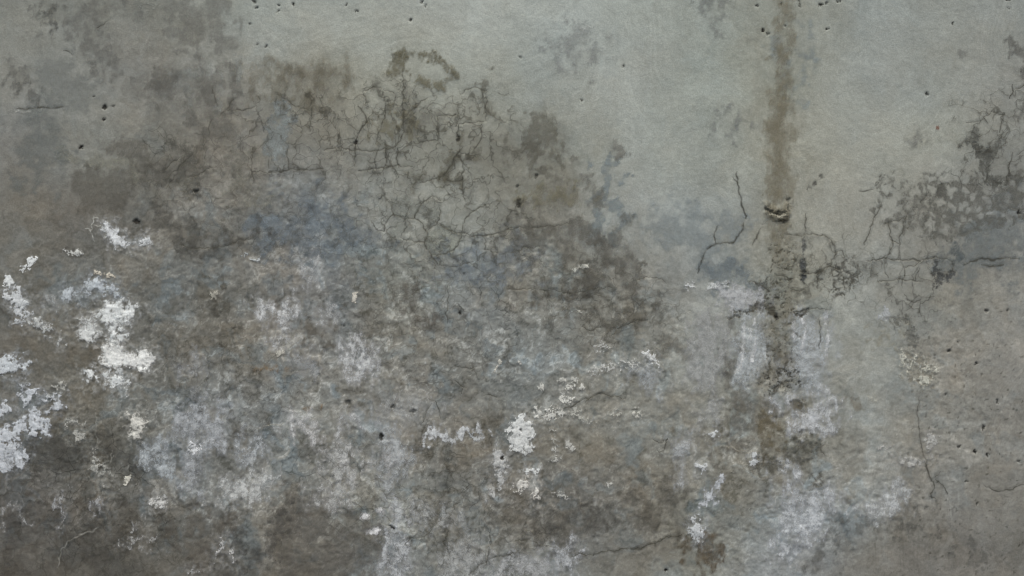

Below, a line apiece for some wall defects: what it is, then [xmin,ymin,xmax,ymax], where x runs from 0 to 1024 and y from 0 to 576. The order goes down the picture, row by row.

crack [164,80,567,322]
crack [697,173,759,274]
crack [747,189,1016,344]
leakage [664,216,910,561]
leakage [899,433,940,467]